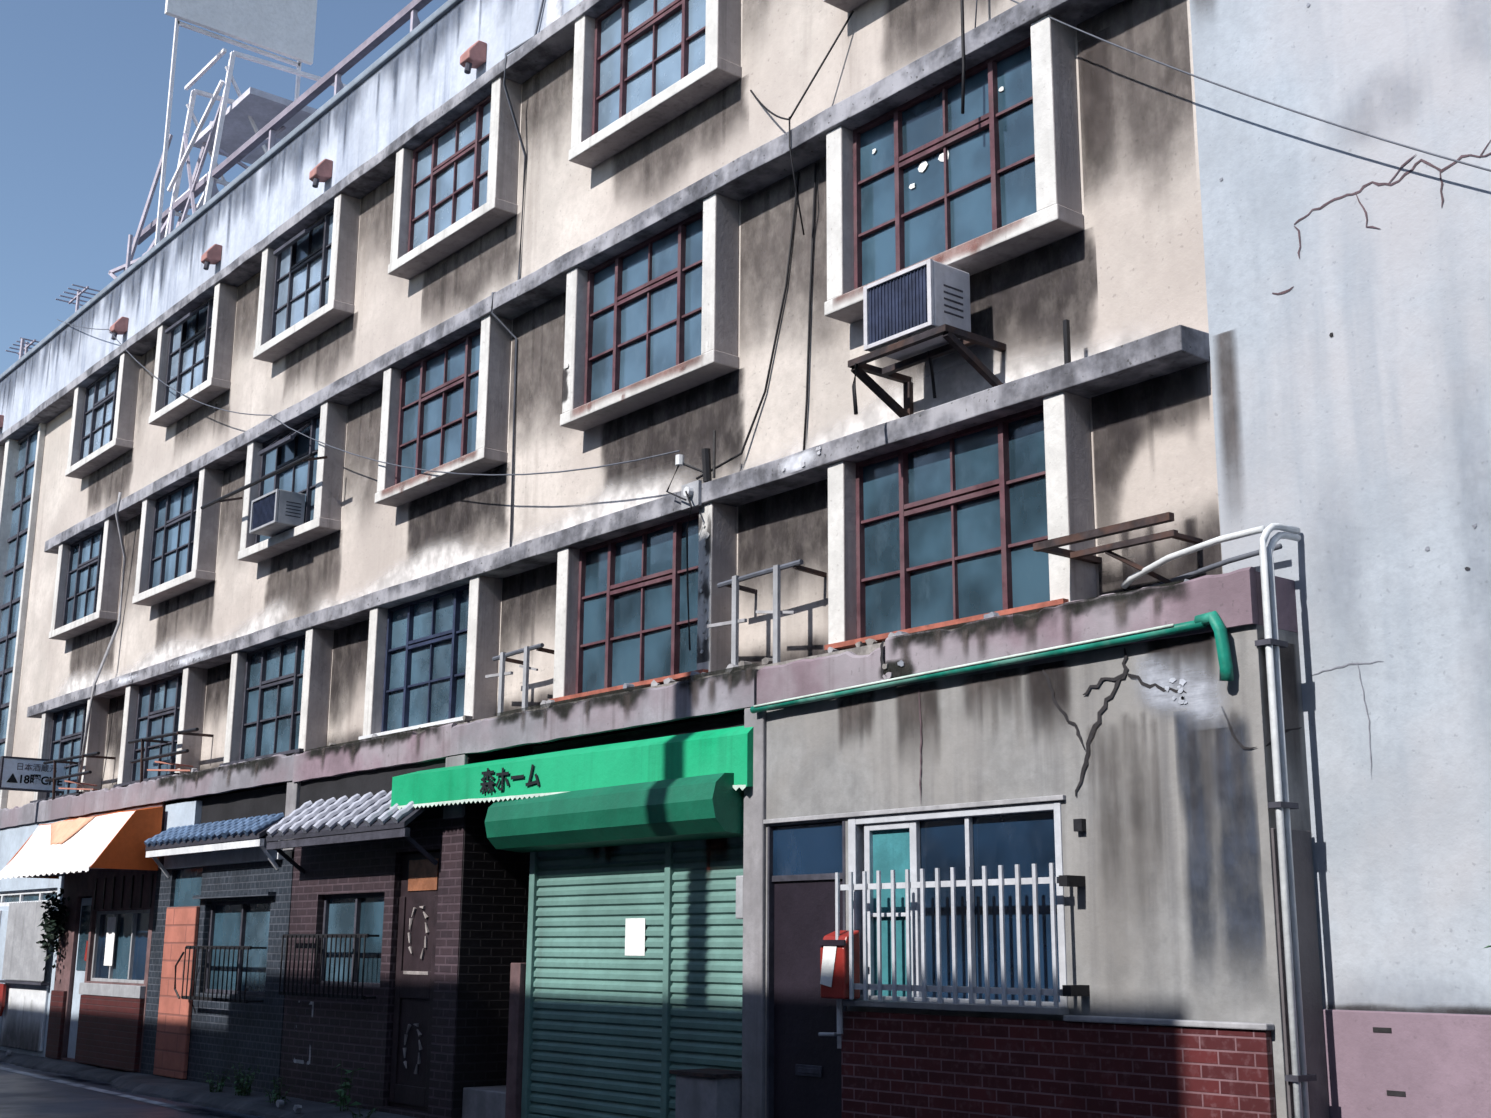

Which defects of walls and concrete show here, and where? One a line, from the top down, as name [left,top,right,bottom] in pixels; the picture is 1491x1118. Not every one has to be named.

damp [520,47,574,138]
damp [1077,0,1193,189]
damp [0,87,358,407]
damp [359,175,395,236]
damp [740,156,827,319]
crack [1272,140,1491,295]
damp [509,292,566,423]
damp [60,369,743,763]
damp [738,479,828,585]
crack [1042,648,1186,797]
crack [1221,706,1302,750]
damp [1175,710,1263,950]